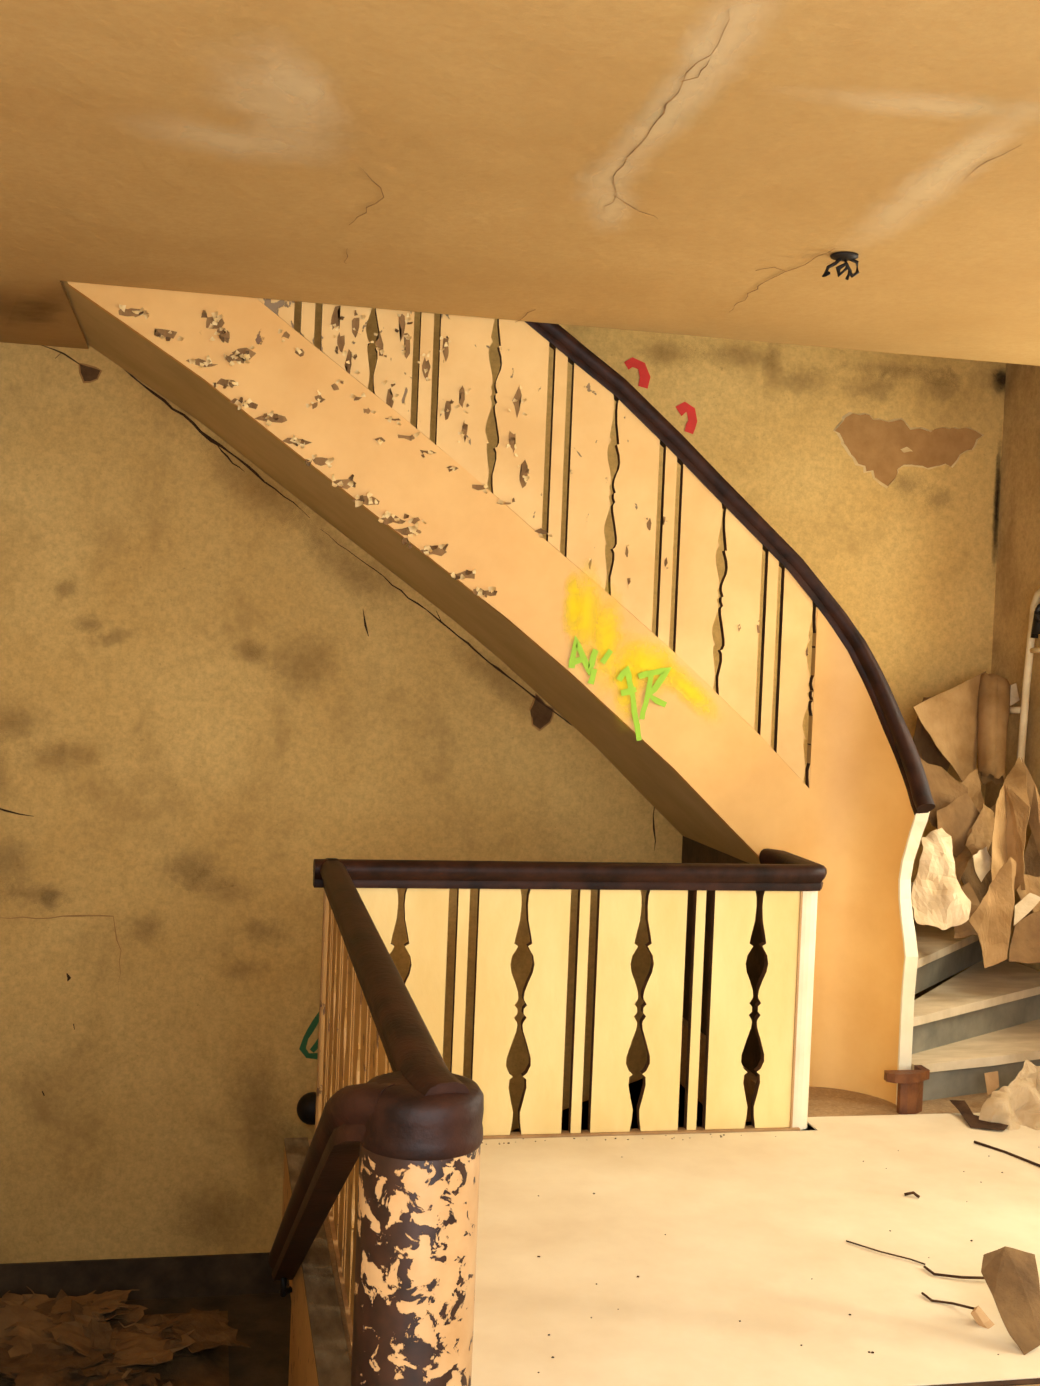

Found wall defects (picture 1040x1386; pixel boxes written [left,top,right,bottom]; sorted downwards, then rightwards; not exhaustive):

crack [604,10,730,219]
crack [731,248,835,311]
peeling [119,304,183,341]
peeling [186,306,452,556]
peeling [440,385,471,443]
peeling [472,385,529,505]
peeling [833,412,984,488]
peeling [450,569,497,597]